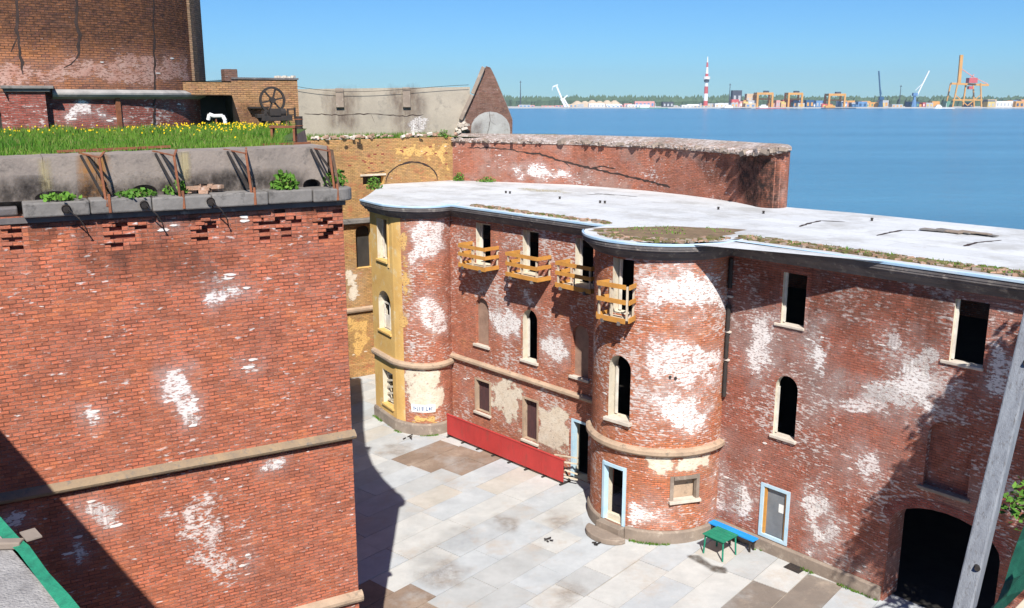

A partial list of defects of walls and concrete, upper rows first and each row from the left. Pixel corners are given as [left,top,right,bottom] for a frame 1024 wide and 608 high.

crack [11,0,24,74]
crack [64,0,82,68]
crack [150,0,158,125]
crack [469,113,670,195]
spalling [252,206,343,240]
damp [160,369,202,427]
peeling [404,369,445,423]
peeling [491,378,523,432]
peeling [538,407,569,455]
damp [633,336,722,436]
damp [815,331,957,416]
damp [158,491,257,597]